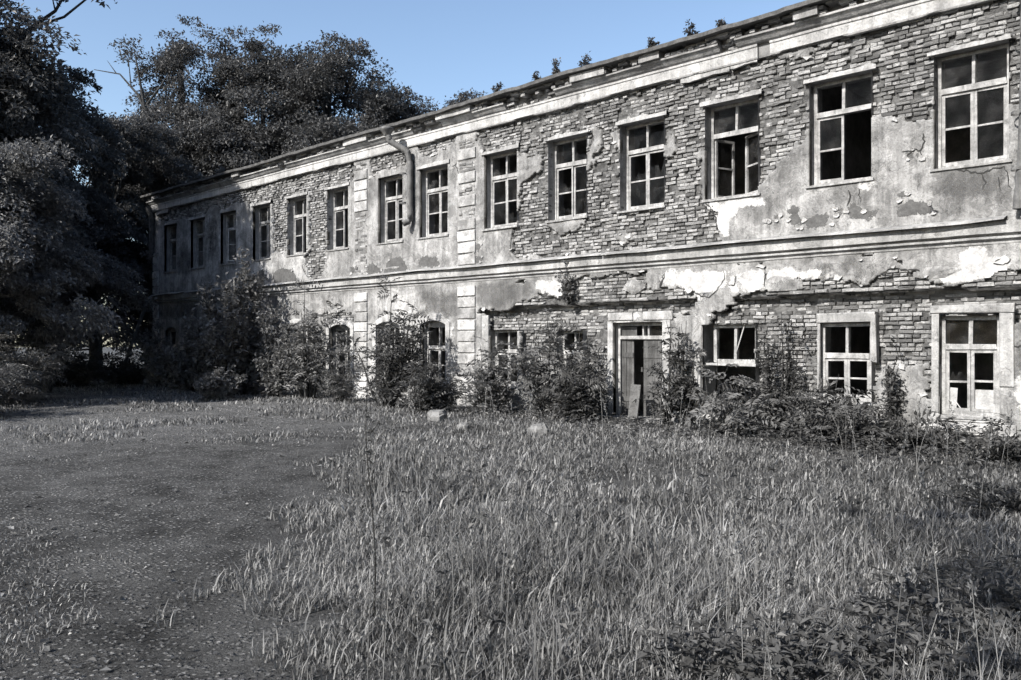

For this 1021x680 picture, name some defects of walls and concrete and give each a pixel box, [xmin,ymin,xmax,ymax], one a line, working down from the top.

flaking render [419,0,1020,259]
flaking render [161,151,406,285]
flaking render [349,213,440,276]
flaking render [481,246,1021,417]